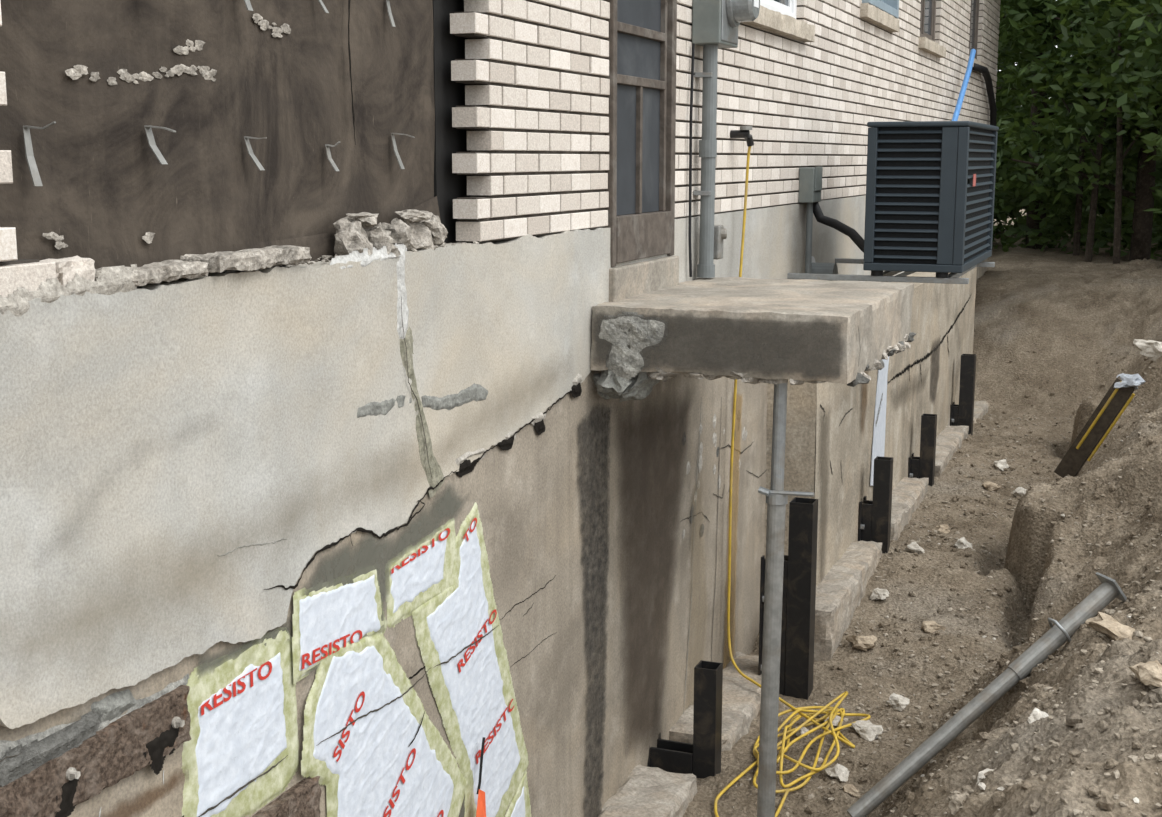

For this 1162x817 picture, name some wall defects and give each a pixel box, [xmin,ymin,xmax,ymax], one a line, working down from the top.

spalling [40,232,312,288]
spalling [333,209,448,257]
spalling [593,312,825,403]
crack [264,244,582,590]
crack [502,575,556,619]
spalling [0,674,189,787]